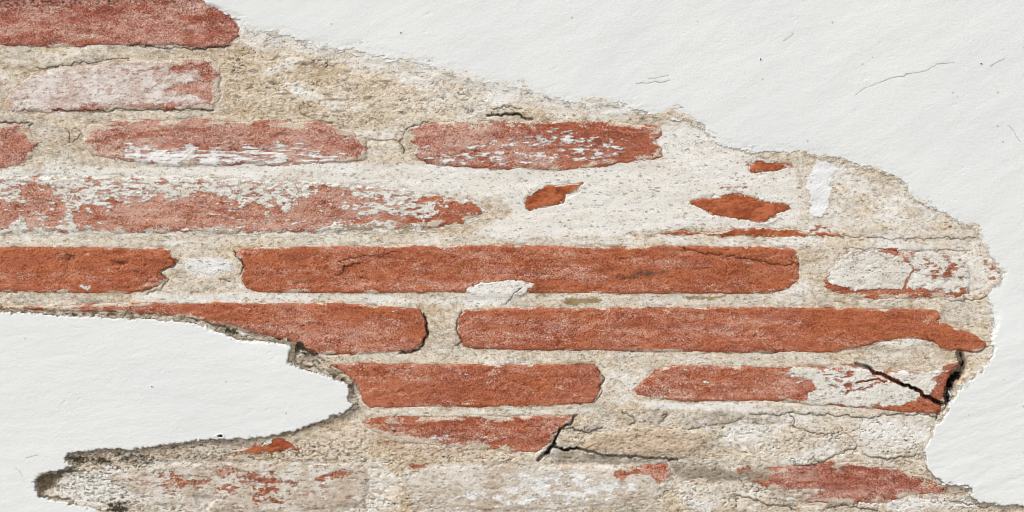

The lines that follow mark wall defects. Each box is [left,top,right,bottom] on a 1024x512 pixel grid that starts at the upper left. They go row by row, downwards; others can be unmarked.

peeling [10,60,209,113]
peeling [421,128,623,166]
spalling [742,145,784,172]
peeling [0,132,487,238]
spalling [523,184,579,210]
spalling [691,189,806,237]
peeling [827,250,972,294]
peeling [0,305,370,512]
crack [660,346,987,466]
peeling [786,365,943,408]
crack [539,417,676,461]
peeling [400,460,678,512]